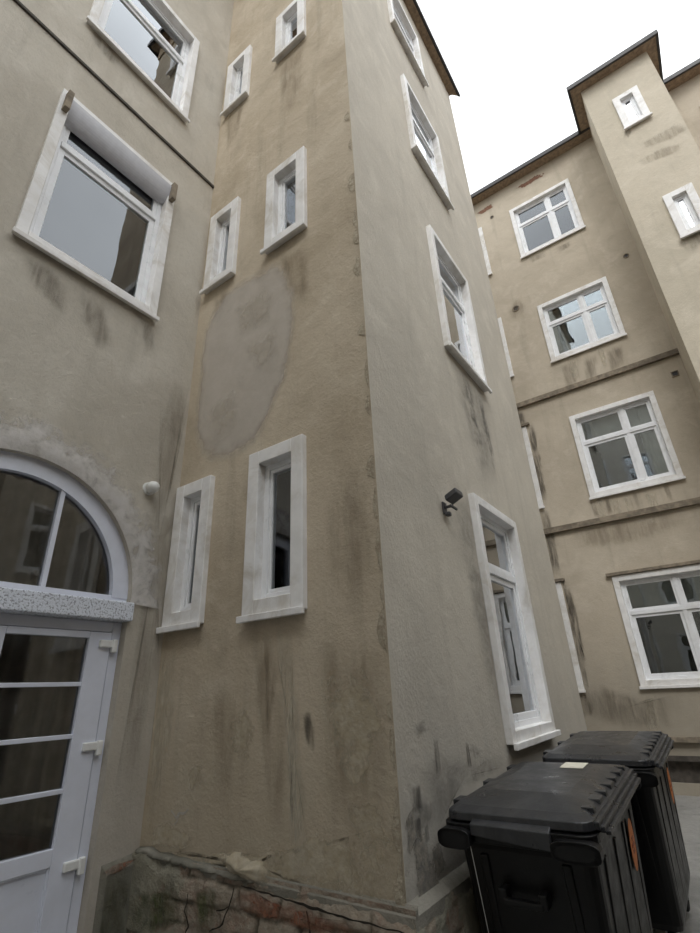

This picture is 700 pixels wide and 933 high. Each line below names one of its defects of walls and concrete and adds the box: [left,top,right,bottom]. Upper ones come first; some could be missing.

spalling [366,455,382,570]
spalling [377,583,387,653]
flaking render [126,789,445,933]
crack [184,885,404,933]